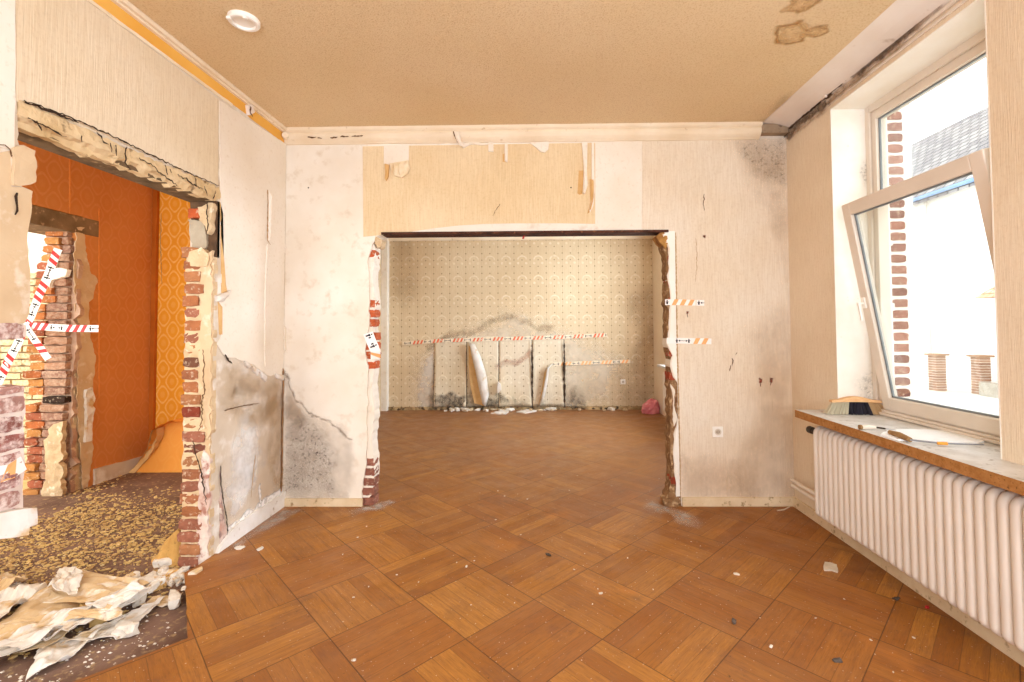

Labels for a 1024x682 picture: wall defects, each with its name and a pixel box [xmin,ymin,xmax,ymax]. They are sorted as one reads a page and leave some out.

leakage [784,22,921,140]
peeling [384,144,410,181]
crack [198,350,258,431]
peeling [225,354,285,382]